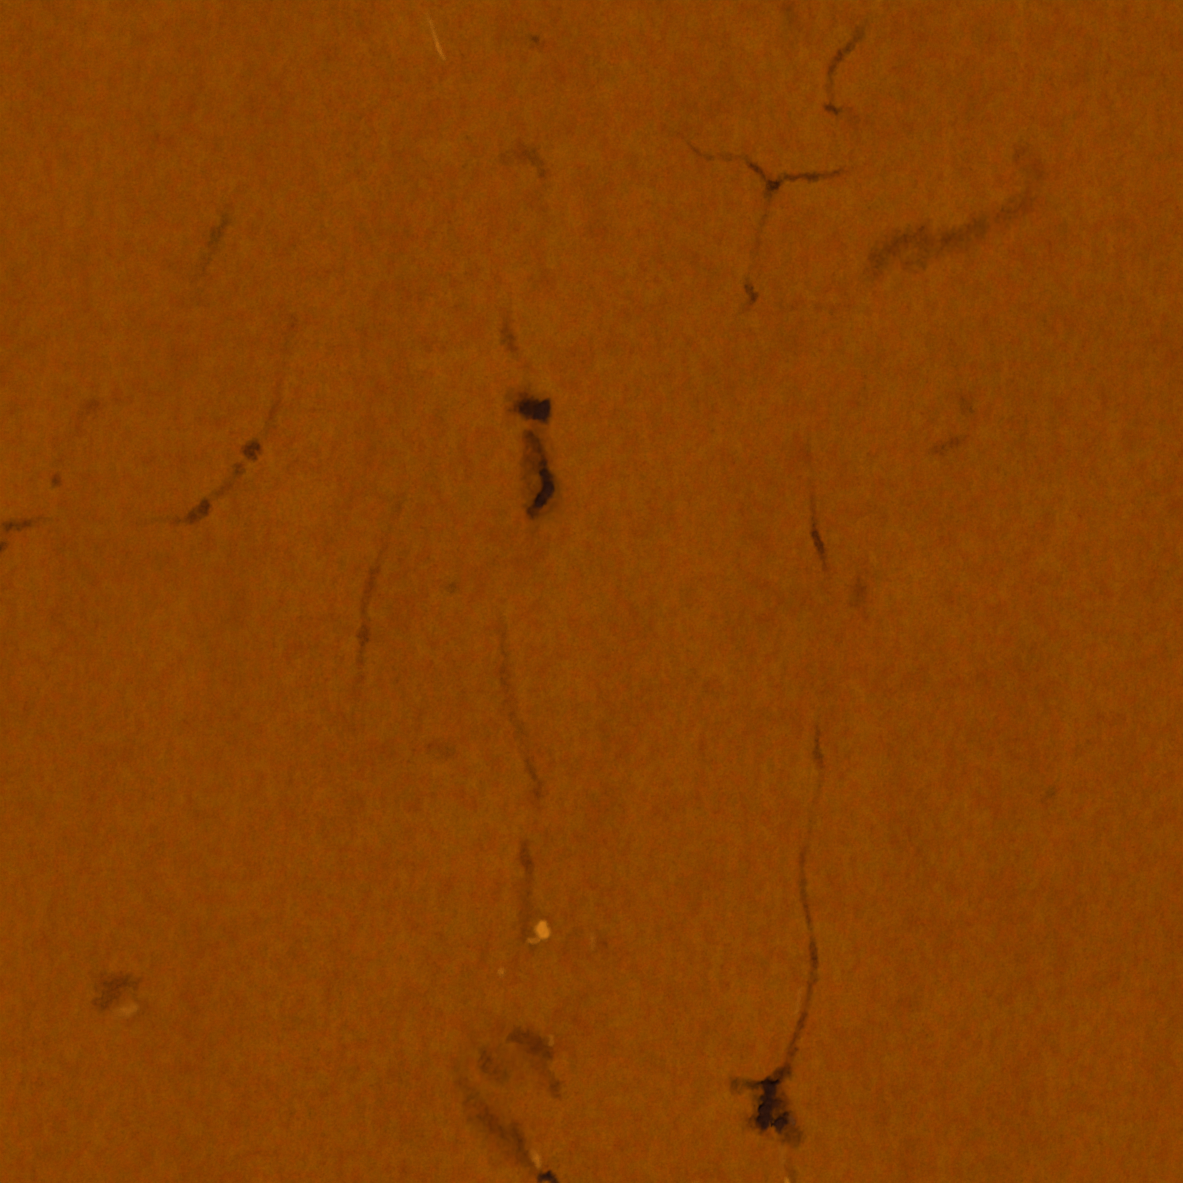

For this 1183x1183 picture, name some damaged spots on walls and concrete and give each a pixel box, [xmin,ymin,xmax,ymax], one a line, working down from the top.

crack [751,164,818,186]
crack [244,443,259,459]
crack [812,525,823,552]